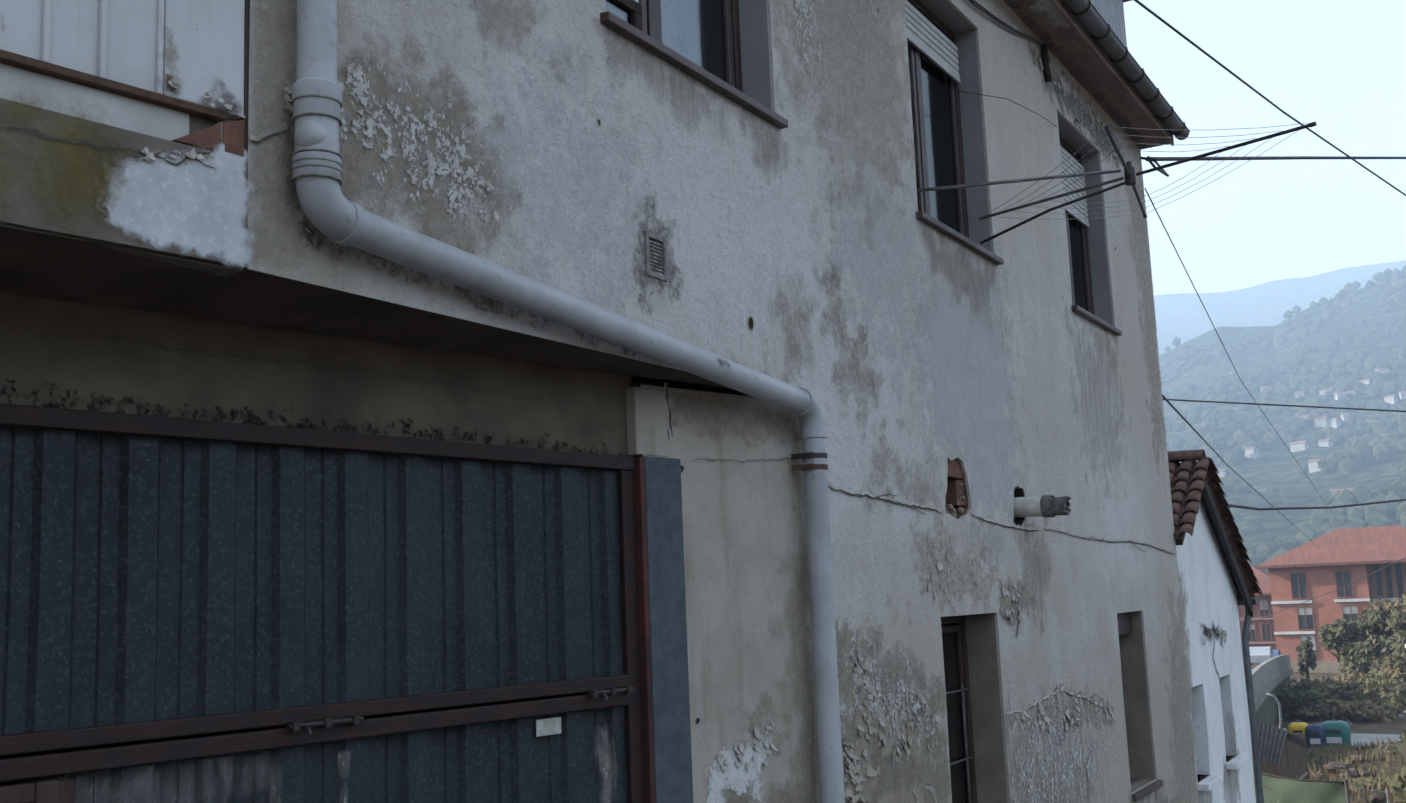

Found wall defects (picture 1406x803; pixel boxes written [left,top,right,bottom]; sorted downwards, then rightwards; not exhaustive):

water stain [337,55,503,254]
water stain [0,379,622,456]
crack [663,383,801,463]
spalling [945,458,968,519]
crack [828,480,1175,555]
peeling [836,628,942,803]
peeling [1014,689,1117,734]
water stain [63,755,280,803]
peeling [706,717,778,803]